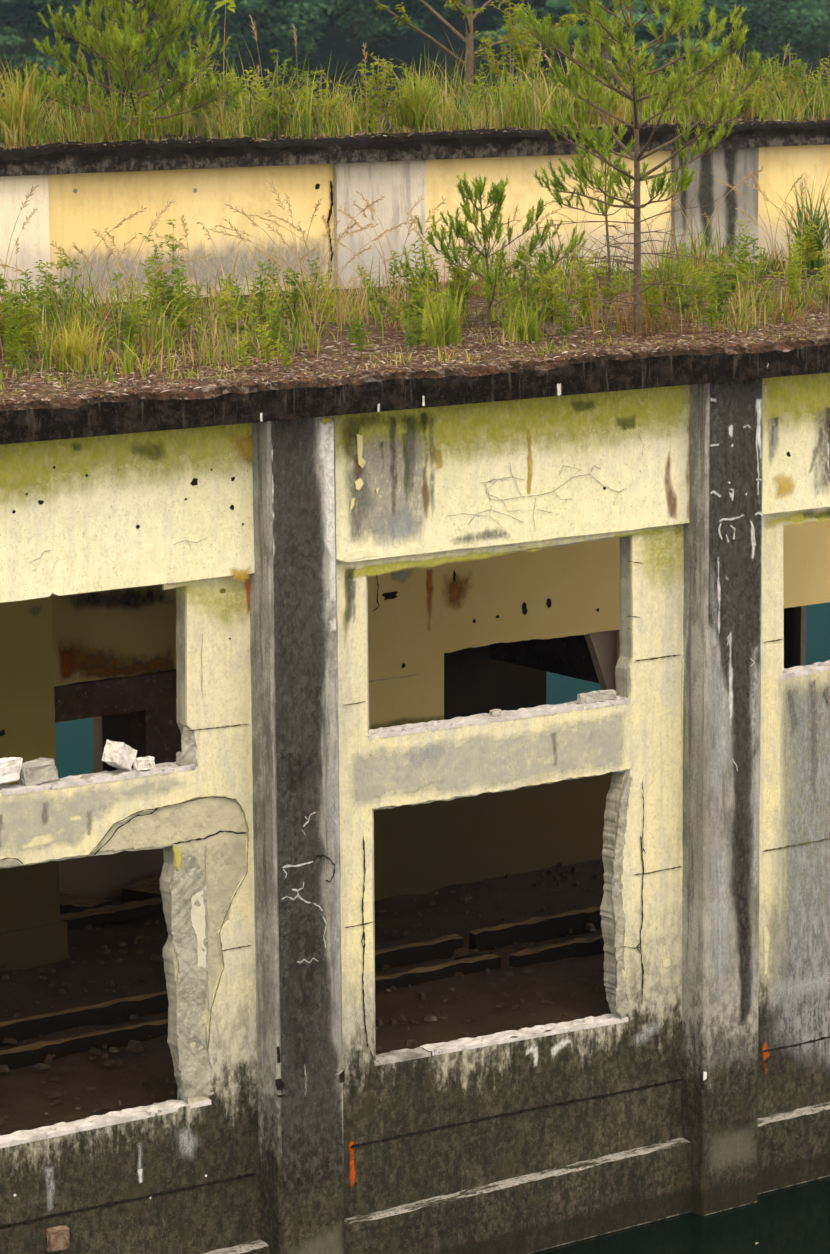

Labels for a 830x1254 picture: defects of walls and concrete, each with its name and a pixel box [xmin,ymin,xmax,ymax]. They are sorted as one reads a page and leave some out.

corrosion [448,576,469,606]
water stain [459,530,505,541]
crack [451,466,627,533]
corrosion [665,458,676,516]
water stain [811,408,830,485]
spalling [91,796,249,1104]
crack [282,812,375,1048]
water stain [260,396,434,1191]
water stain [355,716,623,801]
spalling [612,773,632,1018]
crack [623,782,681,995]
water stain [709,378,778,1022]